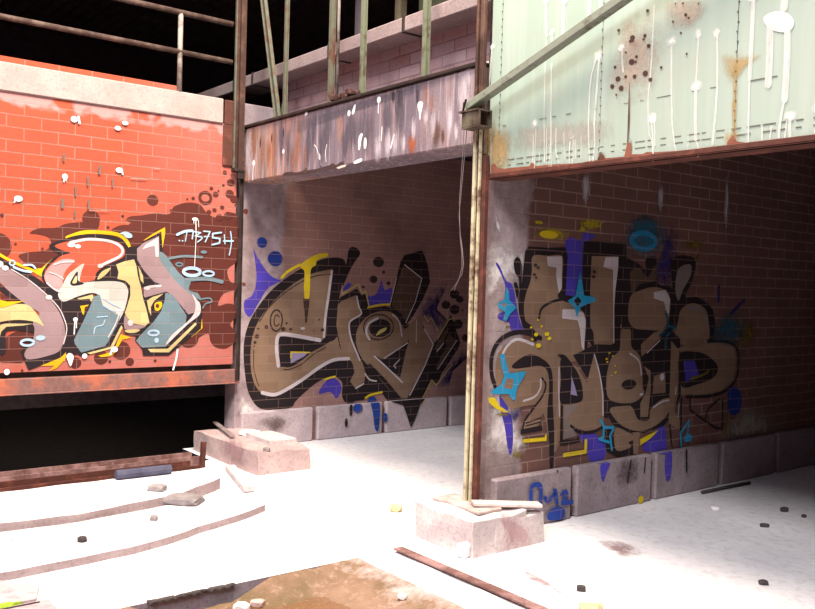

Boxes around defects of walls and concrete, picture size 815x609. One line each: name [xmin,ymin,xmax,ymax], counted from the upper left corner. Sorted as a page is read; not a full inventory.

corrosion [433,124,444,146]
corrosion [729,58,749,137]